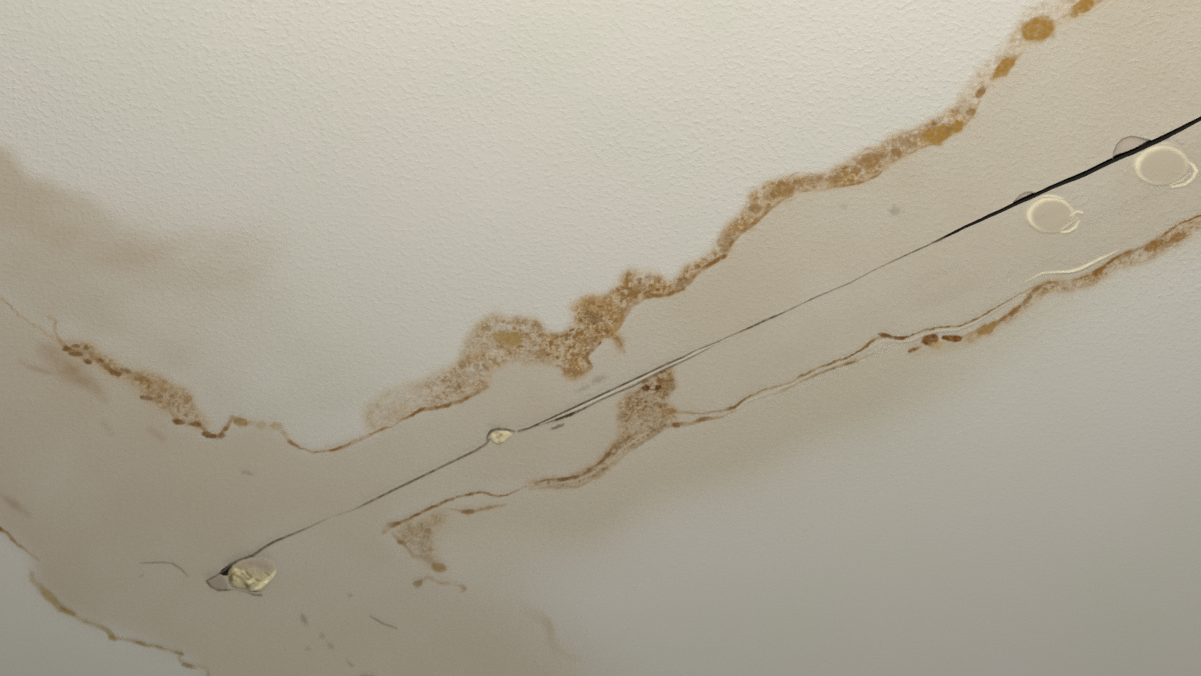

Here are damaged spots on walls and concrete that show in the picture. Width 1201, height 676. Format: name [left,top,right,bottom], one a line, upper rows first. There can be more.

water stain [1022,0,1201,173]
water stain [905,107,966,151]
water stain [750,177,810,218]
water stain [809,136,902,189]
crack [893,116,1201,261]
water stain [1073,248,1142,285]
water stain [493,271,685,387]
crack [521,283,849,430]
water stain [922,319,962,345]
water stain [622,367,675,422]
crack [362,439,490,506]
crack [228,529,304,566]